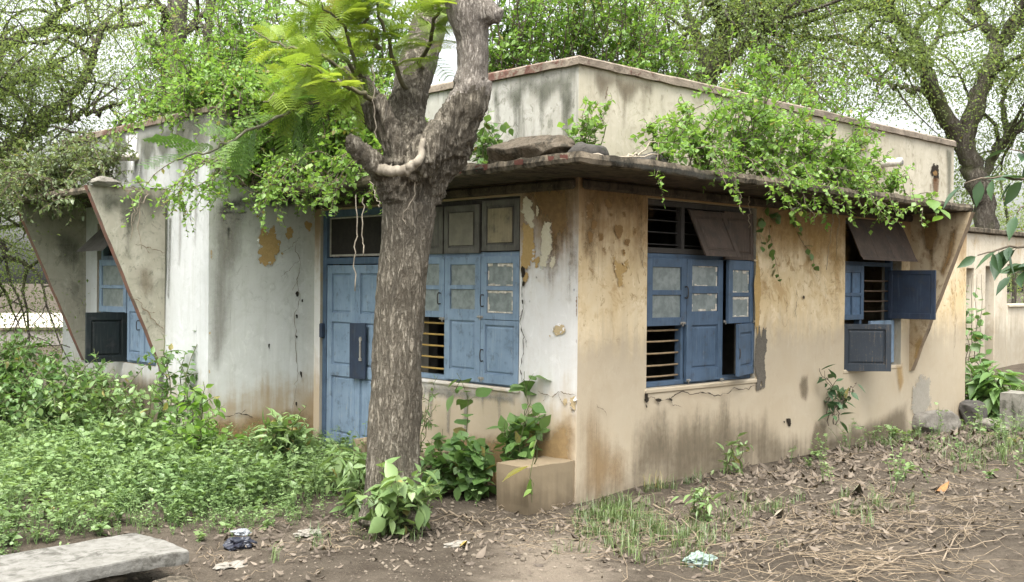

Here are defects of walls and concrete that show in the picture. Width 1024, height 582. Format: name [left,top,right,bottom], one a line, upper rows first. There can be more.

water stain [598,76,635,95]
peeling [257,221,312,267]
peeling [520,196,556,283]
crack [282,237,303,411]
peeling [549,323,565,336]
crack [646,385,754,406]
water stain [644,428,766,467]
water stain [812,425,825,452]
water stain [842,412,905,442]